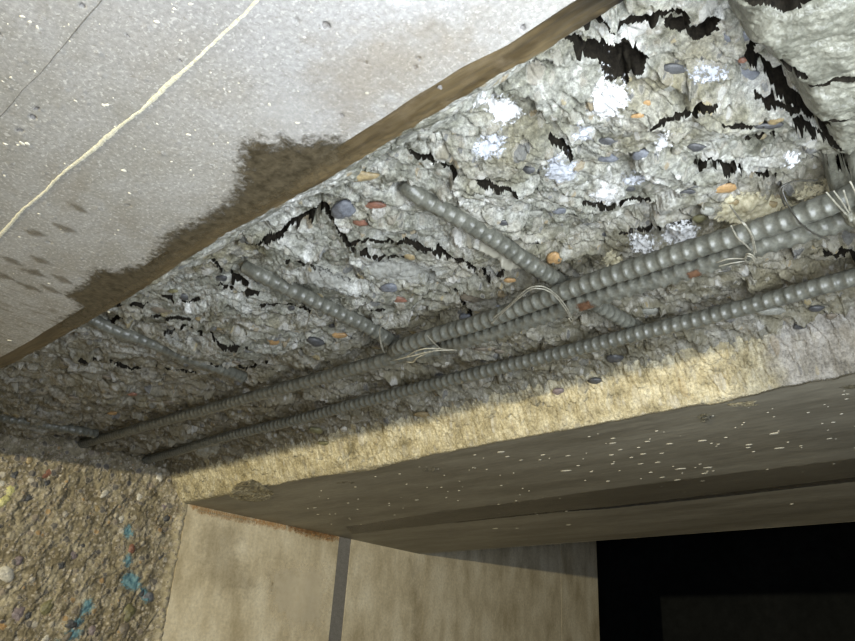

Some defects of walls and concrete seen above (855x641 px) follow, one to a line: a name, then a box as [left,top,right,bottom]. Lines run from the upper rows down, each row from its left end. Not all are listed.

damp [472,91,525,163]
damp [572,62,633,141]
damp [686,61,729,84]
damp [56,135,353,329]
crack [244,200,505,284]
spalling [0,0,855,448]
crack [408,149,518,199]
damp [589,170,646,205]
damp [630,219,701,254]
damp [714,178,830,226]
crack [212,258,311,314]
spalling [0,207,855,641]